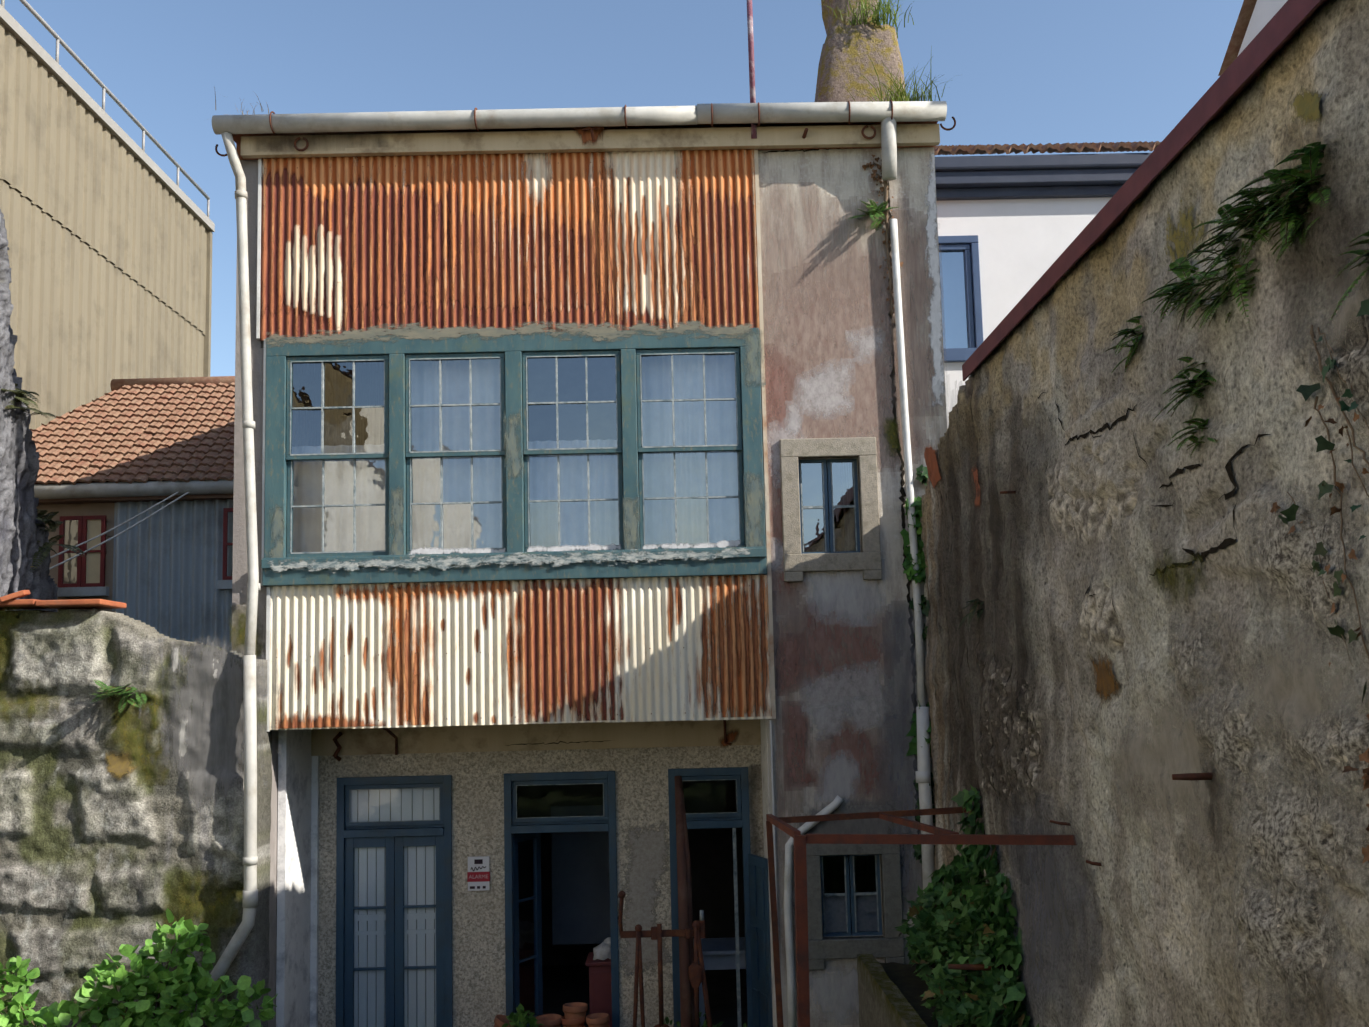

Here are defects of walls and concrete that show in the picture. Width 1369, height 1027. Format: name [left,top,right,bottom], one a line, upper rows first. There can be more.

corrosion [260,126,760,341]
damp [767,334,878,478]
crack [1038,392,1271,576]
damp [149,637,282,820]
corrosion [276,578,630,729]
corrosion [668,578,682,642]
corrosion [696,575,772,747]